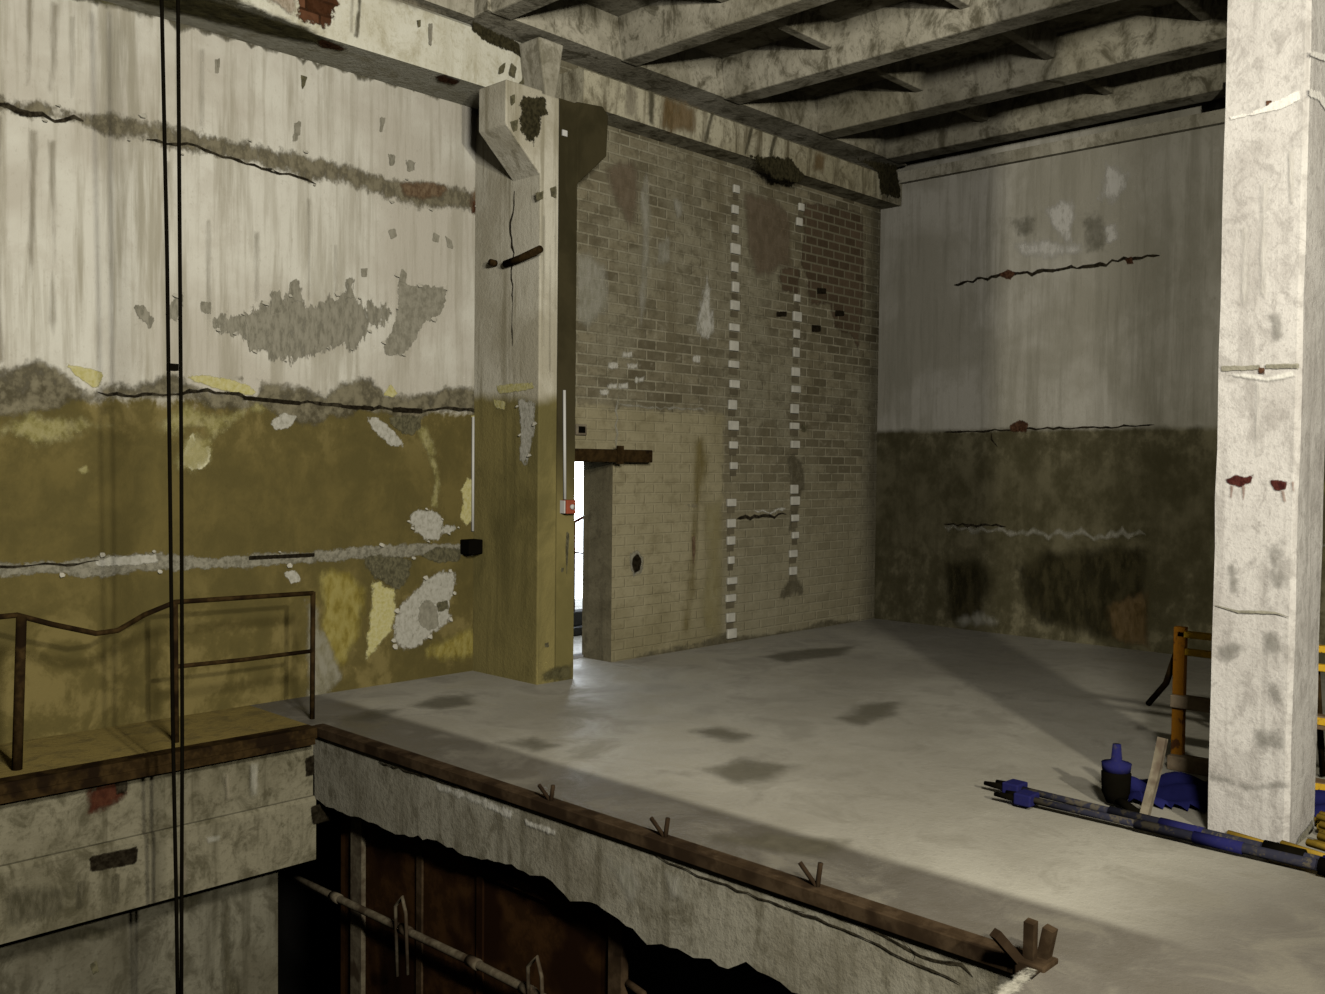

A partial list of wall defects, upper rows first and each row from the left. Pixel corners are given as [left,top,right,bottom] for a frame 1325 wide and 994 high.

flaking render [273,0,340,29]
spalling [470,20,548,143]
crack [508,191,516,346]
crack [954,254,1160,286]
flaking render [134,305,154,328]
flaking render [200,268,448,367]
corrosion [1226,475,1253,498]
corrosion [1271,480,1294,501]
crack [737,508,786,520]
flaking render [0,414,473,696]
crack [379,761,522,807]
crack [656,855,973,984]